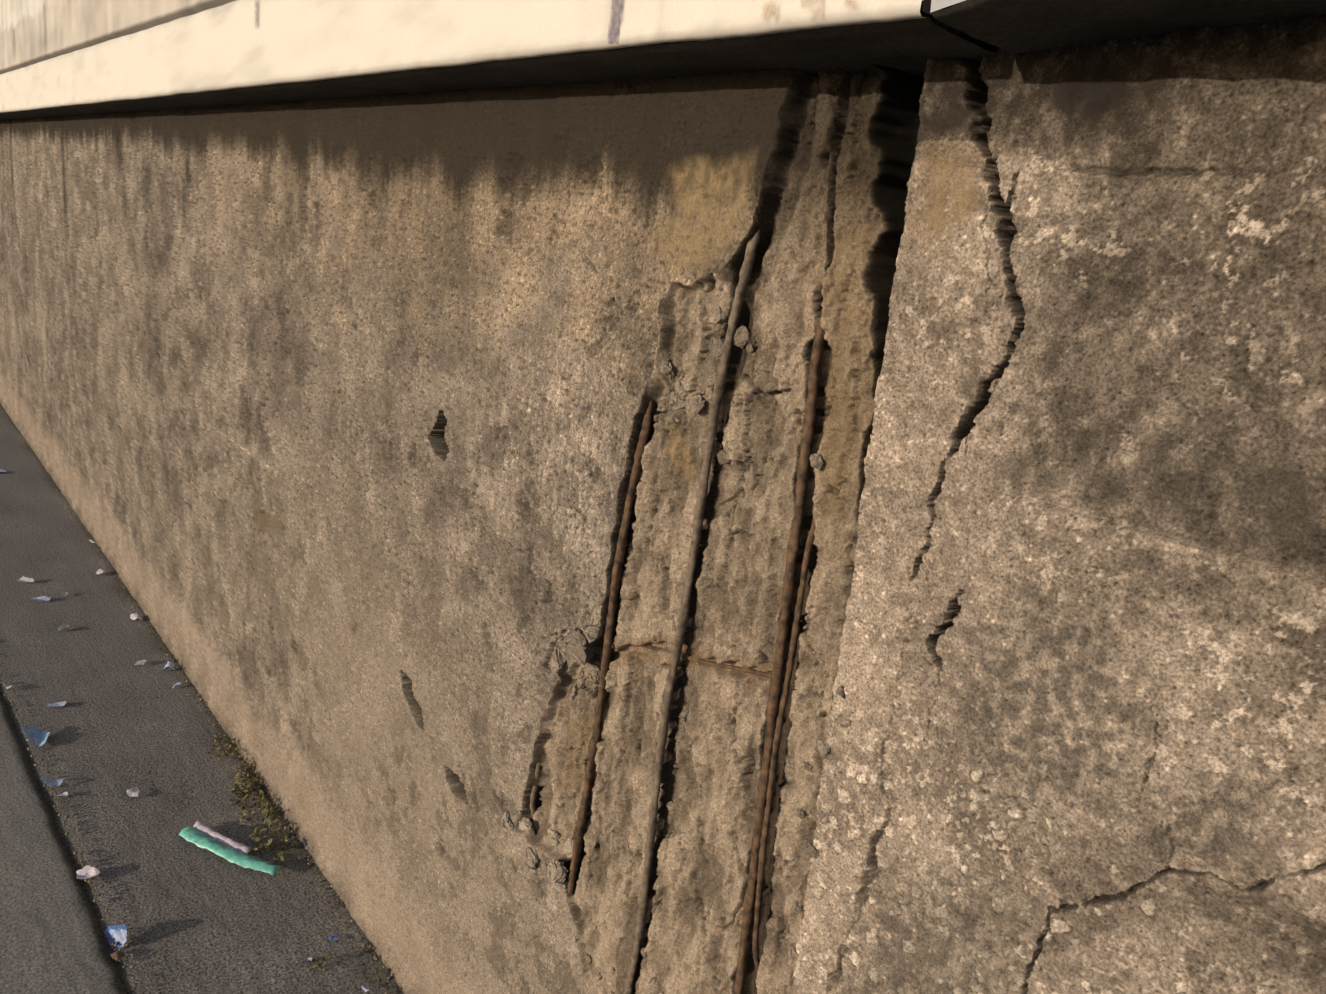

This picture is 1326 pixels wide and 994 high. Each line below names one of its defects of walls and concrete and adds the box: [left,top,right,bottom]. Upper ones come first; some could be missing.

water stain [0,68,796,216]
corrosion [664,165,746,267]
crack [907,36,1027,590]
spalling [501,64,926,994]
crack [922,588,966,746]
crack [1136,710,1160,809]
crack [1019,823,1326,994]